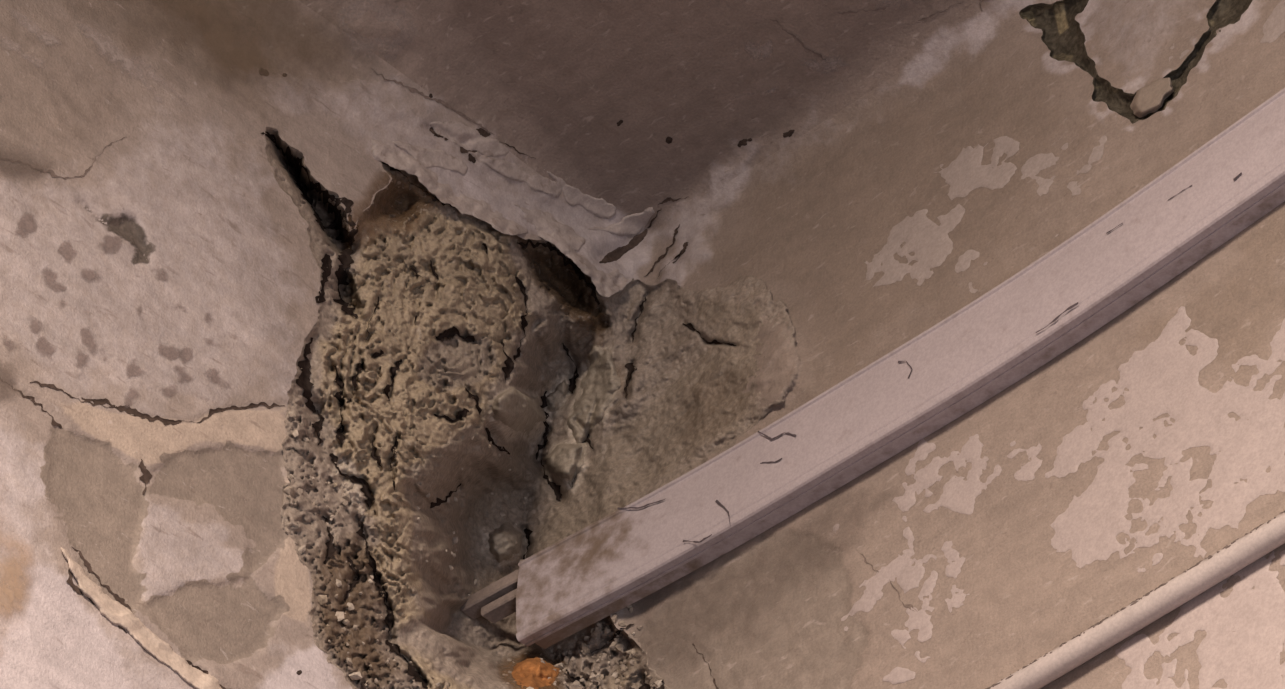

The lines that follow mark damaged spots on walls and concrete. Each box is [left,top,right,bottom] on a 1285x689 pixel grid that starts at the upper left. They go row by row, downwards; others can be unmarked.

peeling [1260,0,1285,43]
peeling [864,135,1107,293]
crack [12,381,285,428]
spalling [261,120,798,689]
crack [139,459,152,495]
peeling [841,306,1285,689]
crack [66,547,133,633]
peeling [61,547,222,689]
rust [499,651,562,689]
crack [692,644,719,689]